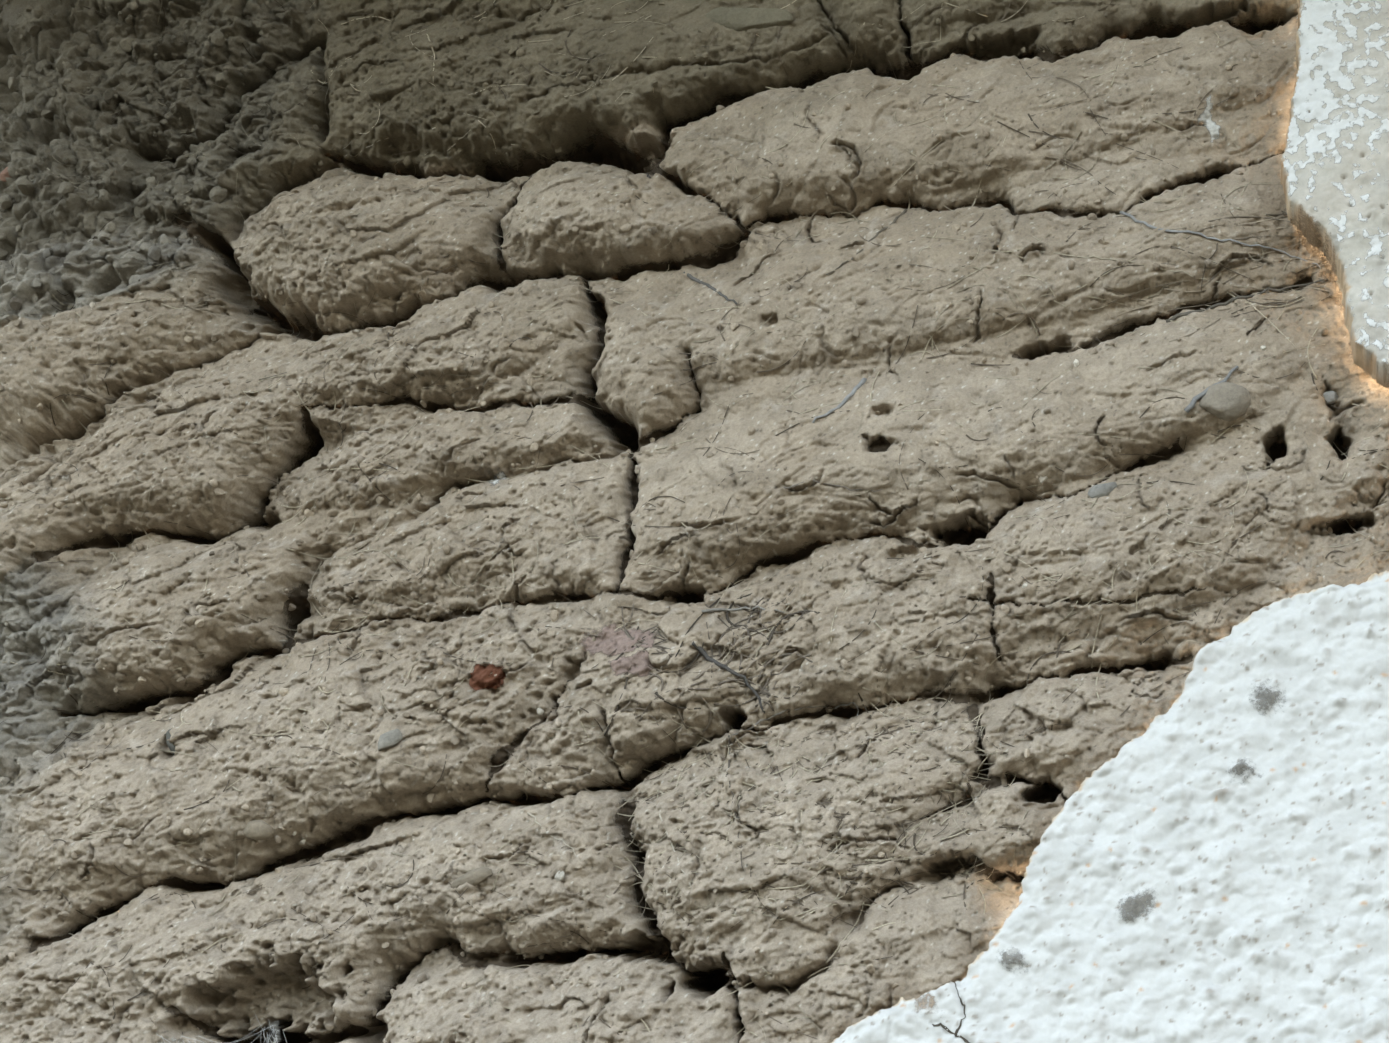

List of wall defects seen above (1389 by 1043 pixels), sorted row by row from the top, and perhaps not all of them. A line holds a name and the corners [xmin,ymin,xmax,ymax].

crack [786,0,1284,89]
crack [875,199,1105,218]
crack [1140,172,1226,204]
peeling [1280,0,1389,388]
crack [1059,277,1312,354]
crack [61,95,939,717]
crack [989,437,1183,532]
crack [31,528,220,562]
crack [728,573,1206,818]
crack [29,680,745,1043]
crack [969,854,1024,883]
crack [932,983,970,1043]